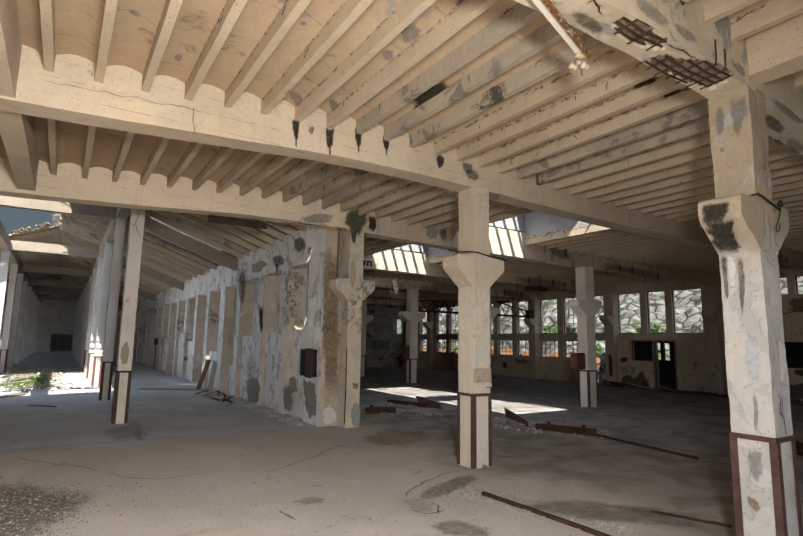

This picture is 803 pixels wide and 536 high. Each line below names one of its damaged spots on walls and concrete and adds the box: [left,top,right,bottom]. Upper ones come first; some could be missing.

spalling [613,0,745,90]
peeling [252,261,267,273]
damp [323,255,338,385]
peeling [246,379,260,403]
peeling [283,348,347,425]